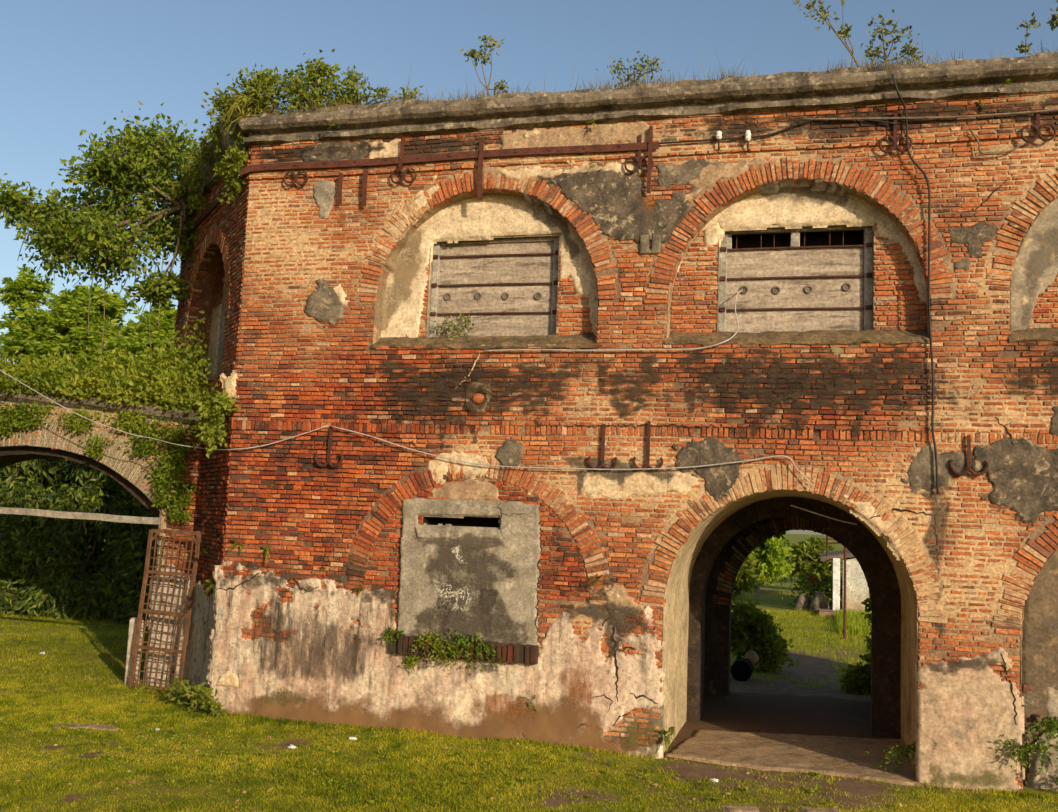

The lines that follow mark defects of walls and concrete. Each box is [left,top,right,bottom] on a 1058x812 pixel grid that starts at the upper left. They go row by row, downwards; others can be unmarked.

water stain [685,389,695,419]
water stain [411,534,529,647]
peeling [601,584,648,618]
crack [580,609,658,730]
spalling [604,705,664,747]